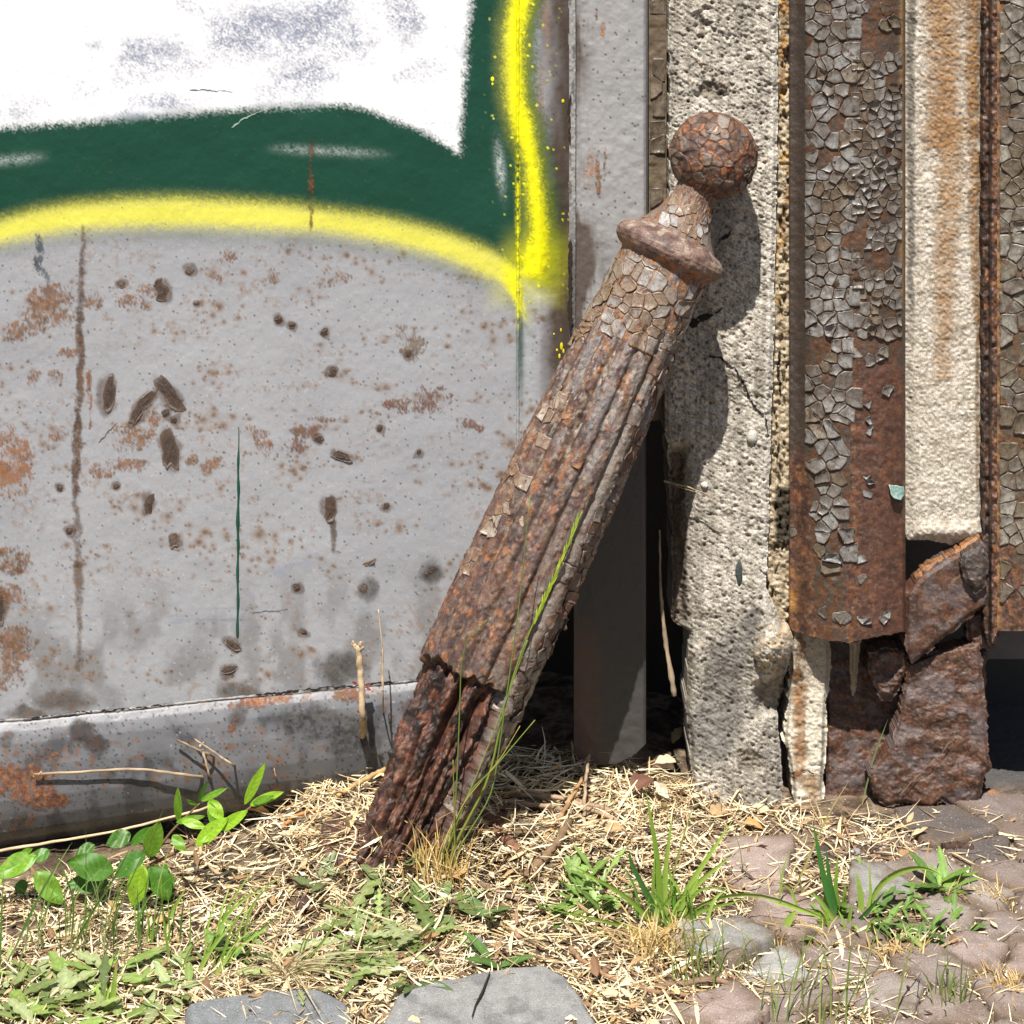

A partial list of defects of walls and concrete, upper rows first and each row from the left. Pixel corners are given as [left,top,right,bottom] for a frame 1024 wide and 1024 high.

rust [925,0,981,419]
rust [4,239,224,493]
rust [244,417,335,456]
rust [321,495,337,550]
rust [330,450,352,463]
crack [707,351,785,461]
peeling [804,0,905,585]
peeling [999,0,1024,603]
rust [0,547,38,690]
peeling [818,606,891,625]
rust [777,635,819,801]
spalling [804,696,824,764]